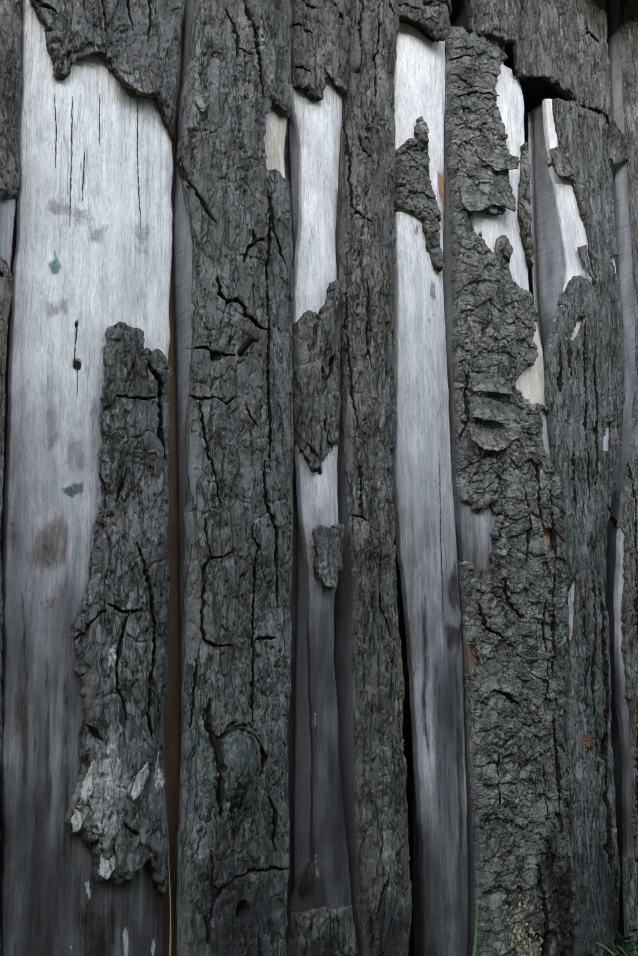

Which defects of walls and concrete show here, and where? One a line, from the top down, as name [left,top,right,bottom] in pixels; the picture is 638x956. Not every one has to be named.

crack [54,95,101,227]
crack [135,100,143,226]
crack [177,157,217,223]
peeling [264,62,344,323]
peeling [393,22,445,252]
damp [23,672,68,825]
peeling [0,0,173,956]
crack [116,361,166,459]
crack [187,191,289,944]
peeling [287,443,352,916]
peeling [392,207,498,956]
damp [70,881,129,956]